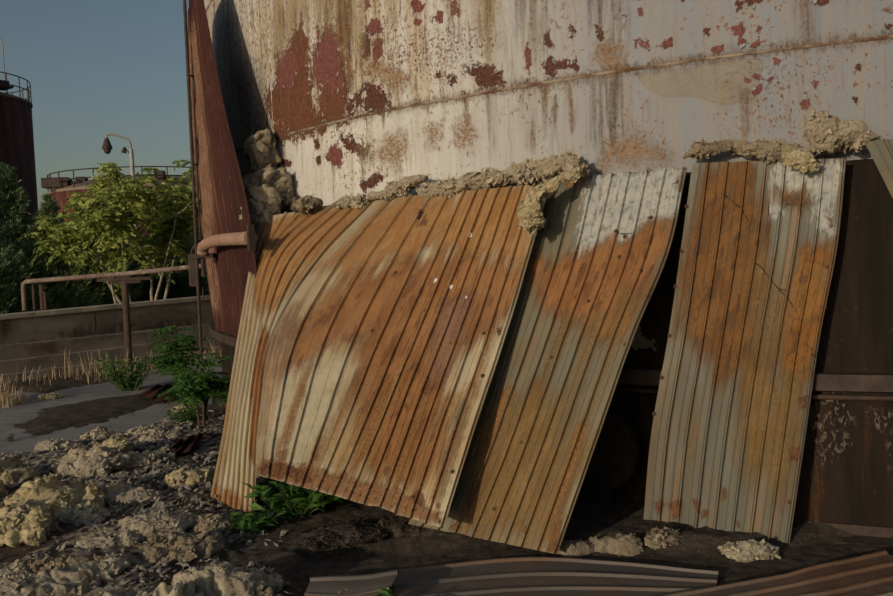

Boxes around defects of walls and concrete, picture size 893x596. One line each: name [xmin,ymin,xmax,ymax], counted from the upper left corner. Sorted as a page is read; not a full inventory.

peeling [523,30,580,79]
peeling [594,24,606,42]
peeling [633,37,674,51]
peeling [730,0,763,48]
peeling [264,0,507,193]
peeling [726,57,831,117]
corrosion [188,18,214,239]
corrosion [206,247,221,313]
corrosion [674,161,832,492]
corrosion [249,185,671,554]
corrosion [211,478,243,510]
corrosion [655,500,682,518]